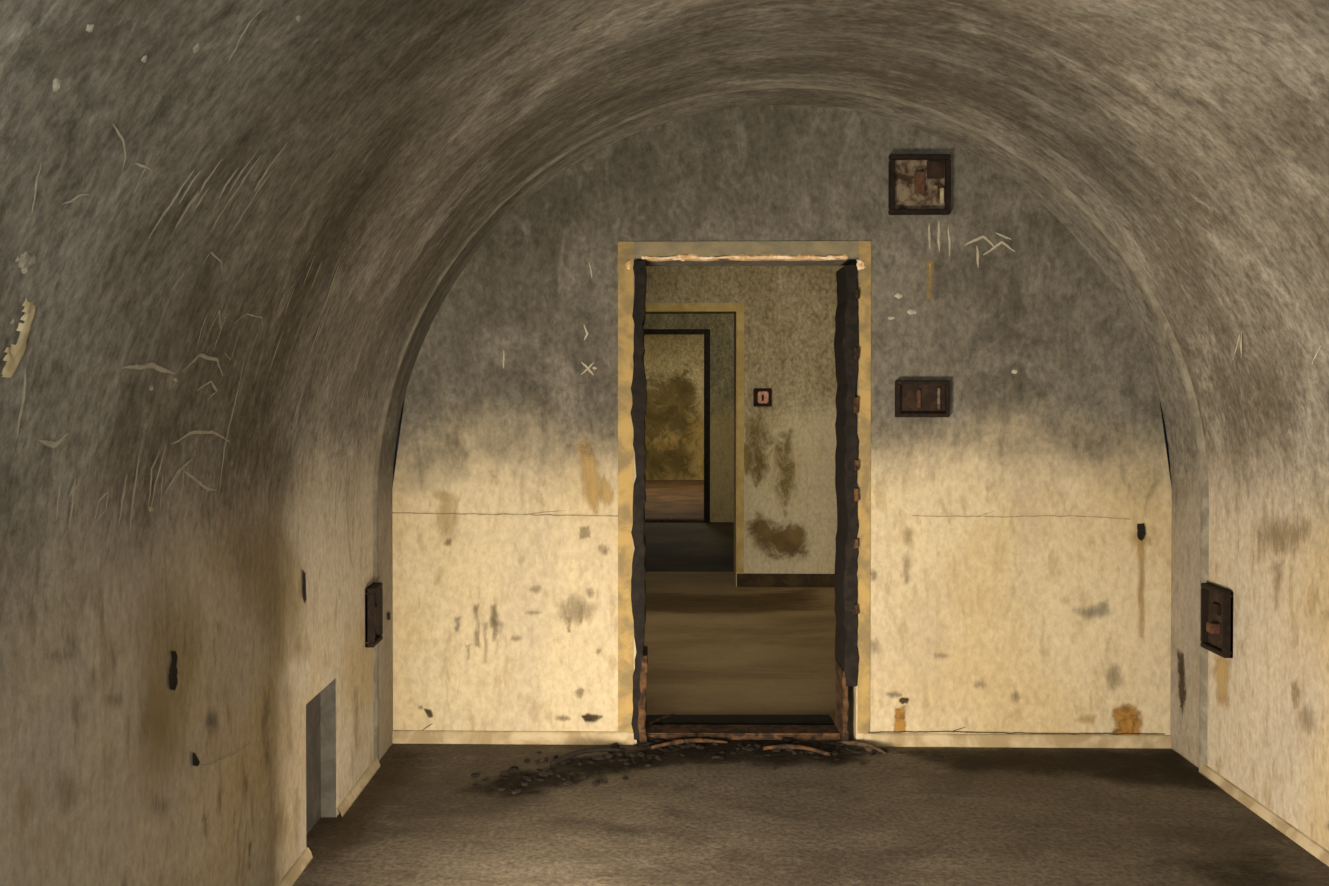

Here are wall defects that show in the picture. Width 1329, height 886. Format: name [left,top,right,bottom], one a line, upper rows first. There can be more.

peeling [15,251,36,274]
peeling [2,298,36,378]
water stain [748,519,807,557]
rust [1112,705,1141,735]